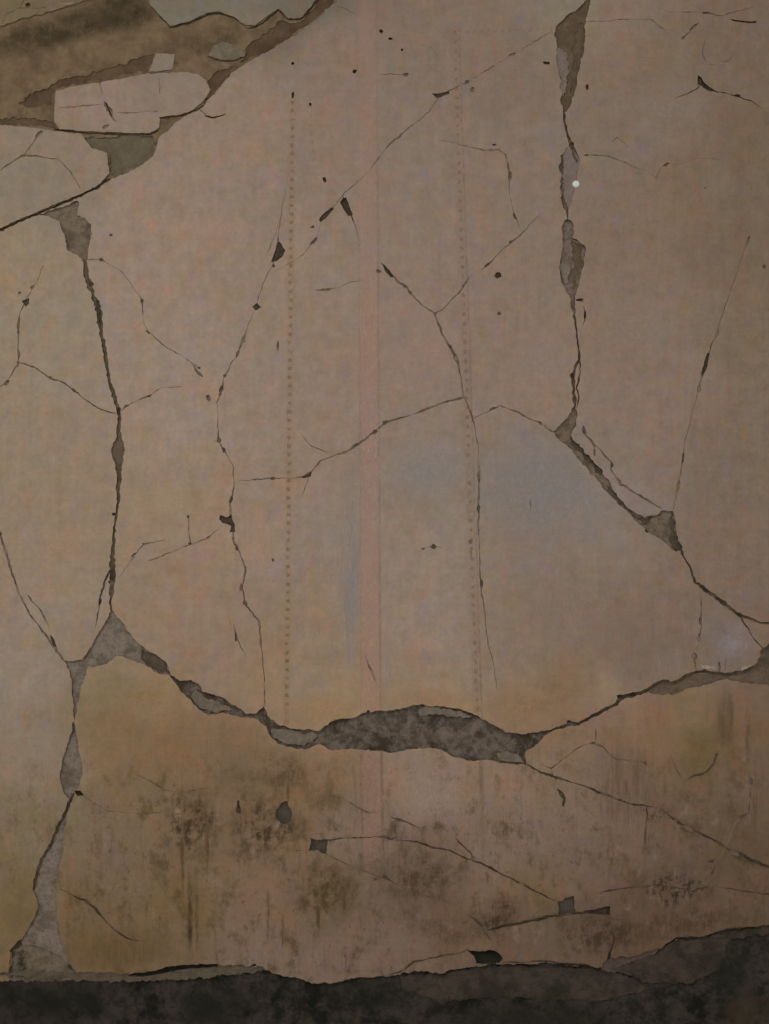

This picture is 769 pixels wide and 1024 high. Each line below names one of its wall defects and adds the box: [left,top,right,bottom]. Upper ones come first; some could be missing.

flaking render [543,0,590,113]
peeling [0,53,210,263]
flaking render [559,146,586,319]
crack [0,31,553,704]
crack [570,236,750,509]
flaking render [553,407,682,552]
crack [33,774,222,942]
damp [168,791,216,945]
damp [233,758,305,852]
damp [297,863,353,928]
flaking render [0,610,769,1024]
crack [295,549,769,975]